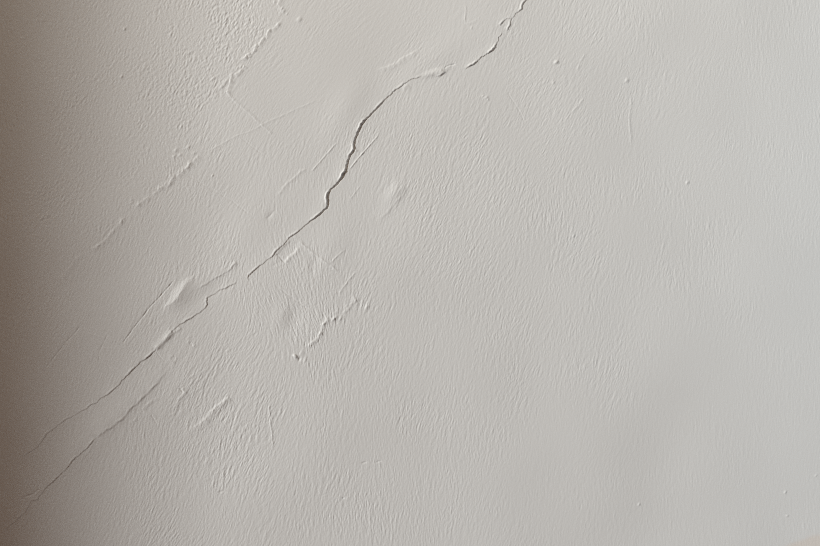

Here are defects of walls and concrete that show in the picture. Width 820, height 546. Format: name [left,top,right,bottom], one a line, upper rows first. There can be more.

crack [16,0,534,462]